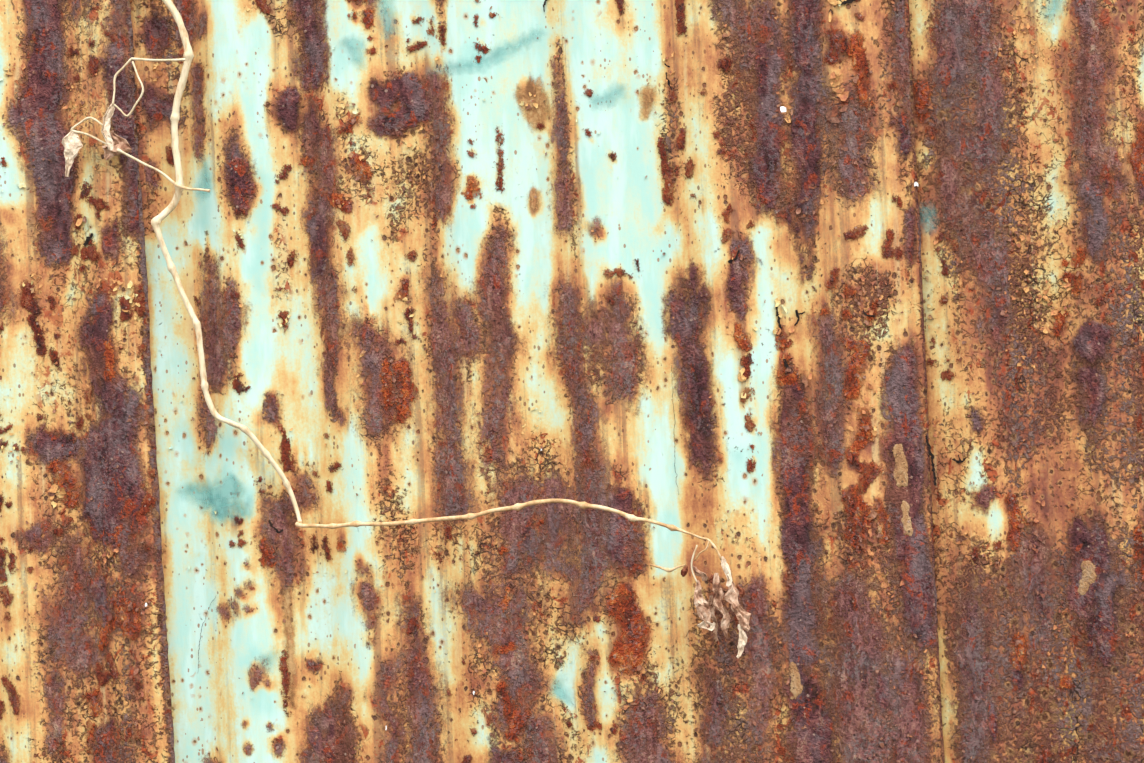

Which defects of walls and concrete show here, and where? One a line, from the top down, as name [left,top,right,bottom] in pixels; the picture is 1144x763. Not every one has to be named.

rust [7,0,174,273]
peeling [772,92,793,123]
peeling [826,69,859,126]
peeling [998,0,1038,94]
rust [270,0,679,763]
rust [662,262,719,481]
peeling [839,276,884,334]
rust [693,0,1144,763]
peeling [990,350,1043,439]
peeling [988,231,1080,334]
rust [0,284,157,763]
rust [229,392,346,717]